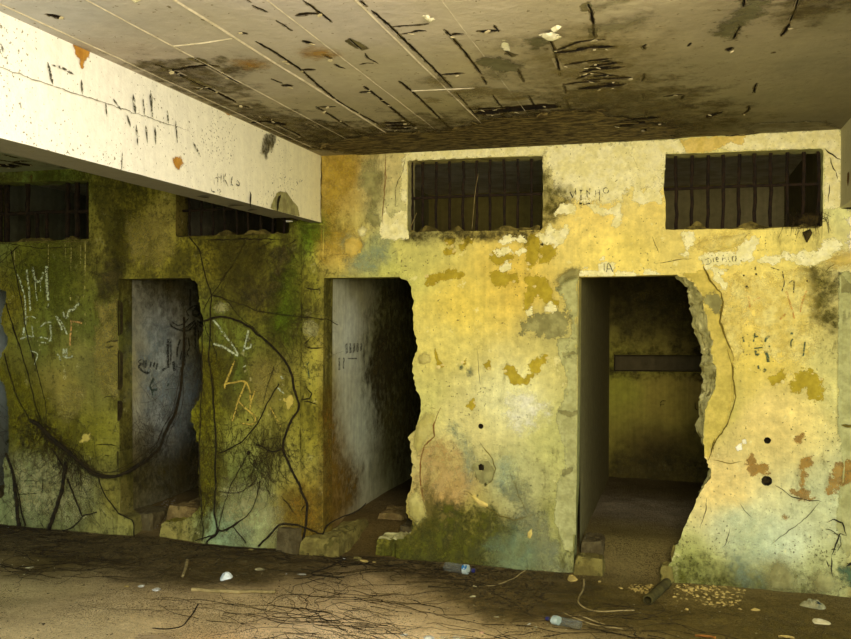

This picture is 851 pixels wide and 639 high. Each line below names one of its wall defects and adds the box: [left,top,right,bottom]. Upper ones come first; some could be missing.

corrosion [73,44,90,69]
spalling [539,1,633,91]
crack [1,67,185,130]
peeling [379,207,474,256]
spalling [485,203,664,551]
crack [653,239,741,464]
peeling [666,221,843,460]
spalling [837,271,851,558]
leakage [12,459,89,519]
corrosion [745,453,771,479]
corrosion [789,456,816,502]
corrosion [824,459,851,495]